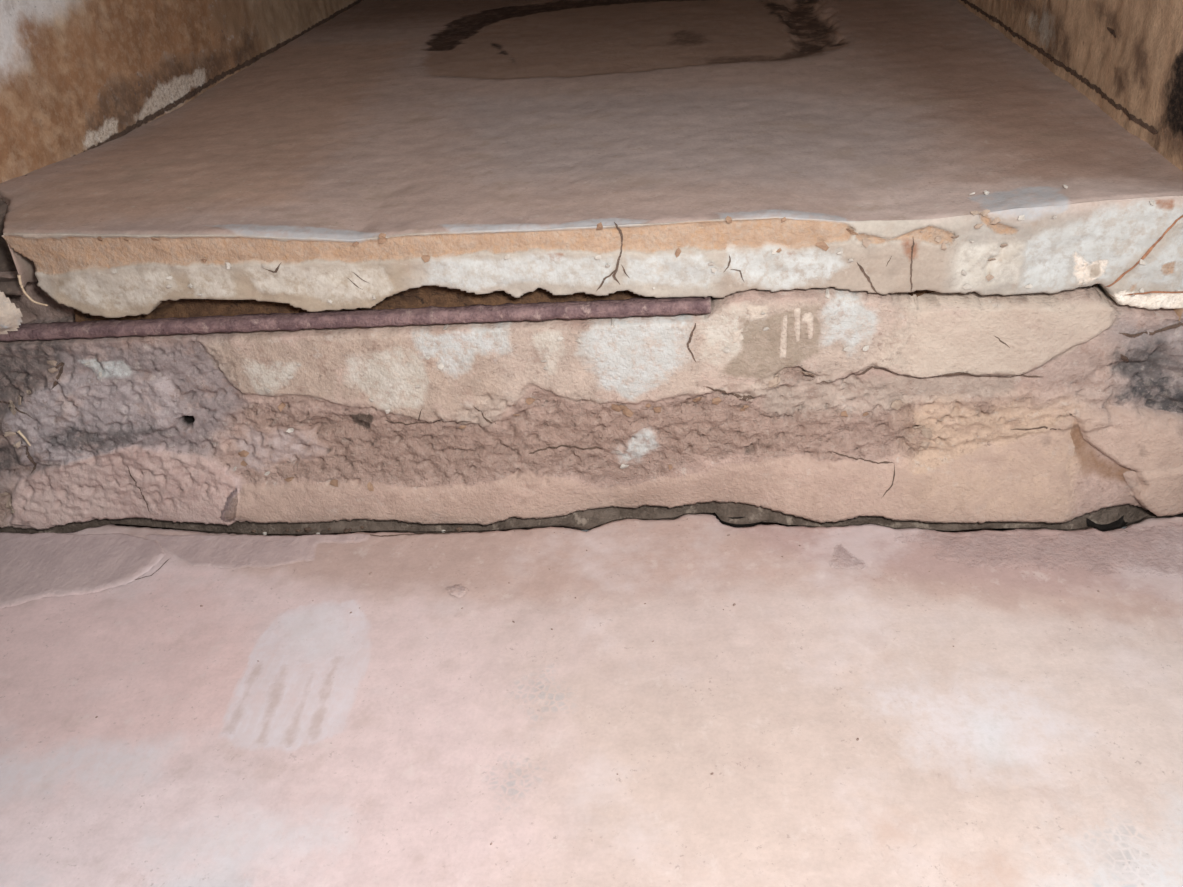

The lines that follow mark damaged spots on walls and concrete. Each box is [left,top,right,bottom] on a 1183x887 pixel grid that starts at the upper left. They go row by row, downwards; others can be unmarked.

water stain [0,0,356,183]
crack [73,222,655,322]
crack [711,255,745,298]
crack [857,239,936,297]
water stain [1071,251,1183,309]
crack [1087,215,1183,295]
spalling [0,184,1183,491]
crack [687,323,757,401]
water stain [1106,330,1183,413]
crack [1120,322,1183,362]
crack [386,407,496,425]
crack [0,451,1183,537]